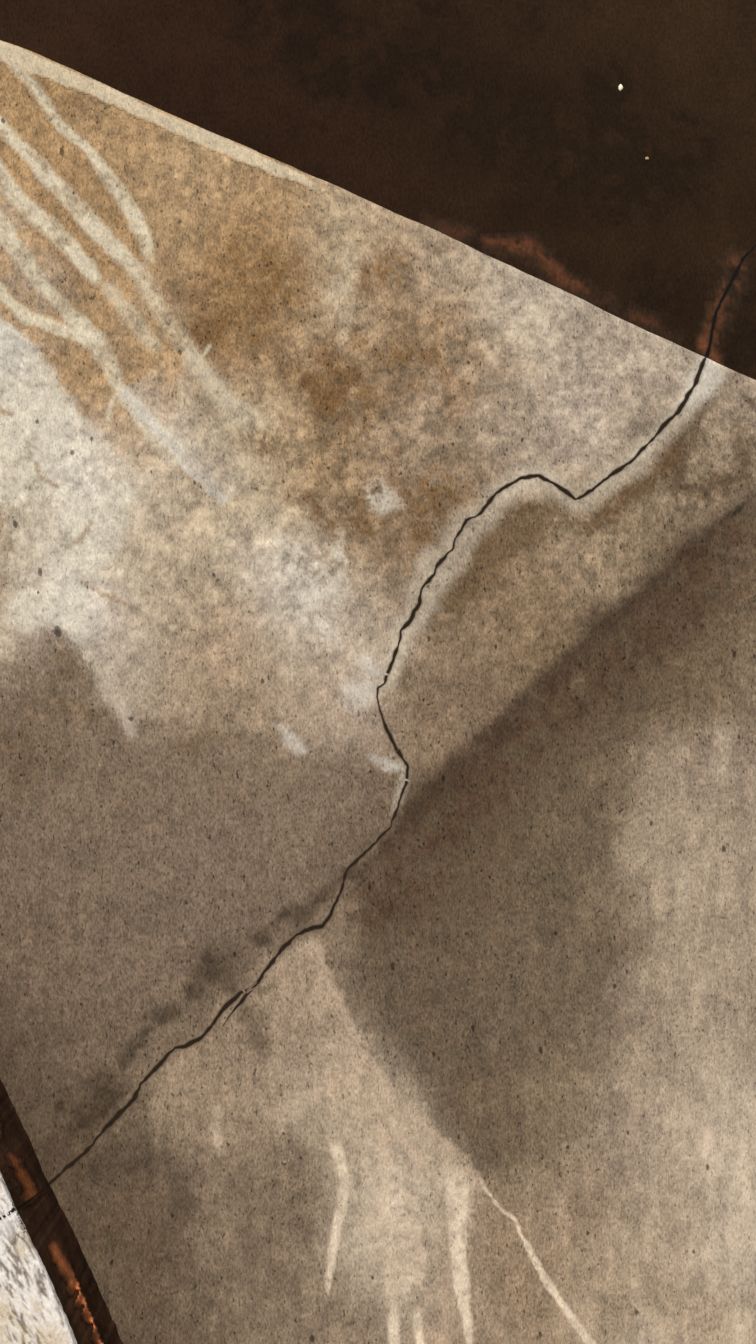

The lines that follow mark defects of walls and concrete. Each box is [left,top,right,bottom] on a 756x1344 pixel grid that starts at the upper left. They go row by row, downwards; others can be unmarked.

damp [0,64,459,1180]
crack [0,243,756,1221]
damp [51,673,756,1344]
damp [174,0,756,963]
rust [419,208,750,366]